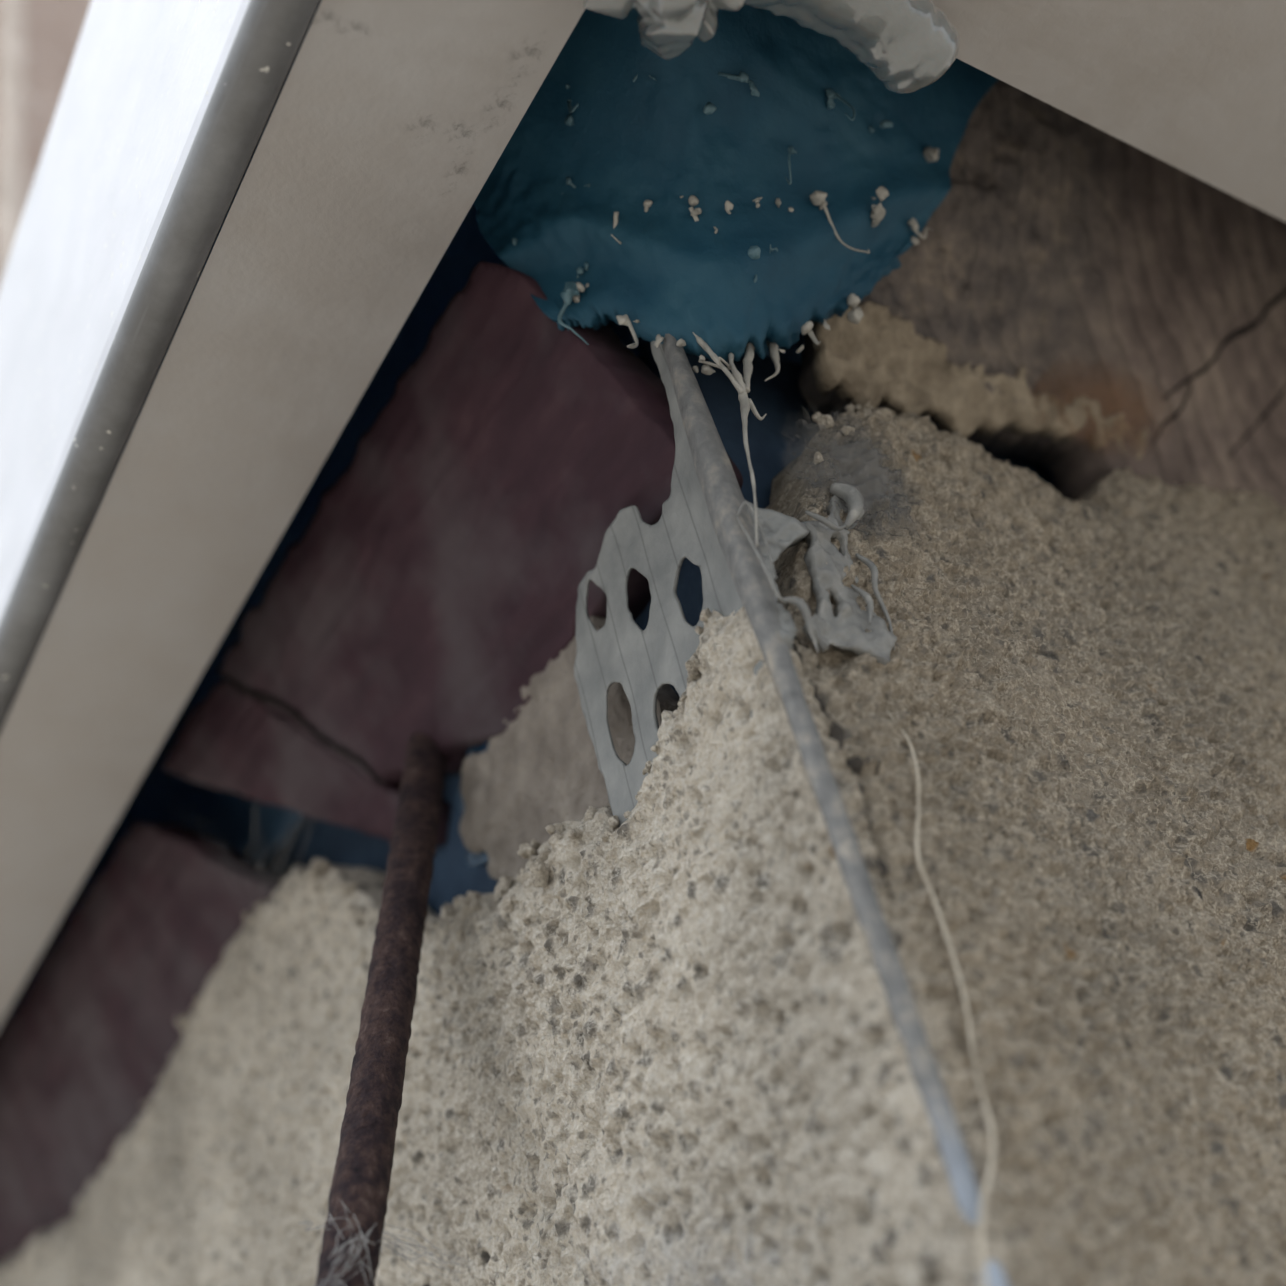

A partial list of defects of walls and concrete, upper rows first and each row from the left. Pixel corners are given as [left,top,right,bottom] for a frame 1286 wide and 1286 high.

spalling [812,404,872,436]
crack [1152,290,1286,443]
spalling [695,608,712,635]
crack [218,672,384,785]
spalling [677,652,701,717]
spalling [424,794,638,940]